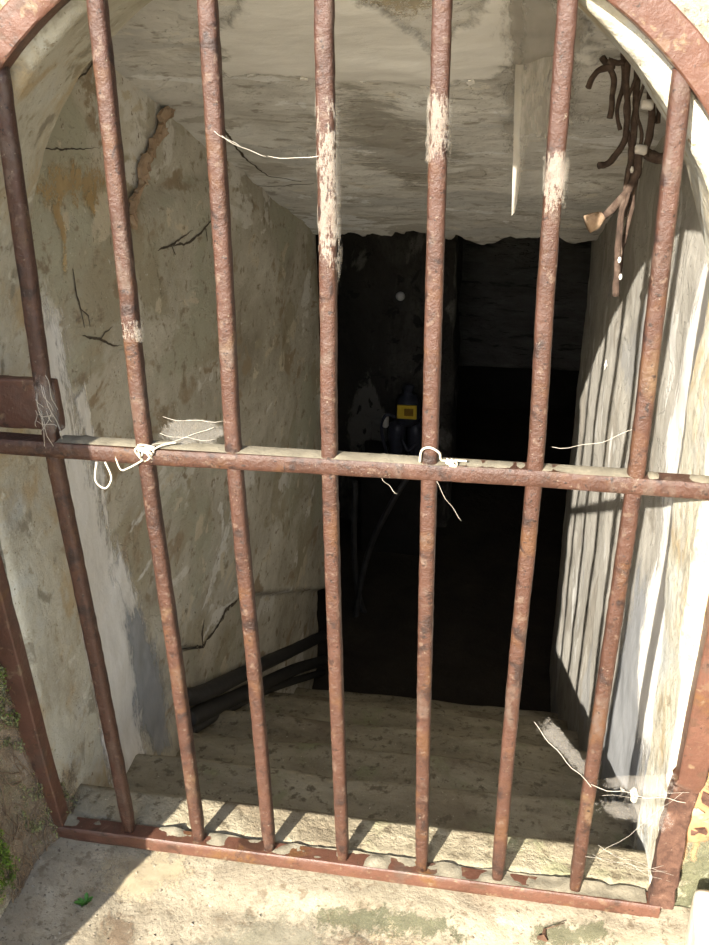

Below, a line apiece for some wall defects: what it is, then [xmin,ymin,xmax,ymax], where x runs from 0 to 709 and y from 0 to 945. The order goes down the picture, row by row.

crack [45,145,96,153]
crack [158,221,211,255]
crack [72,268,122,347]
corrosion [680,771,709,870]